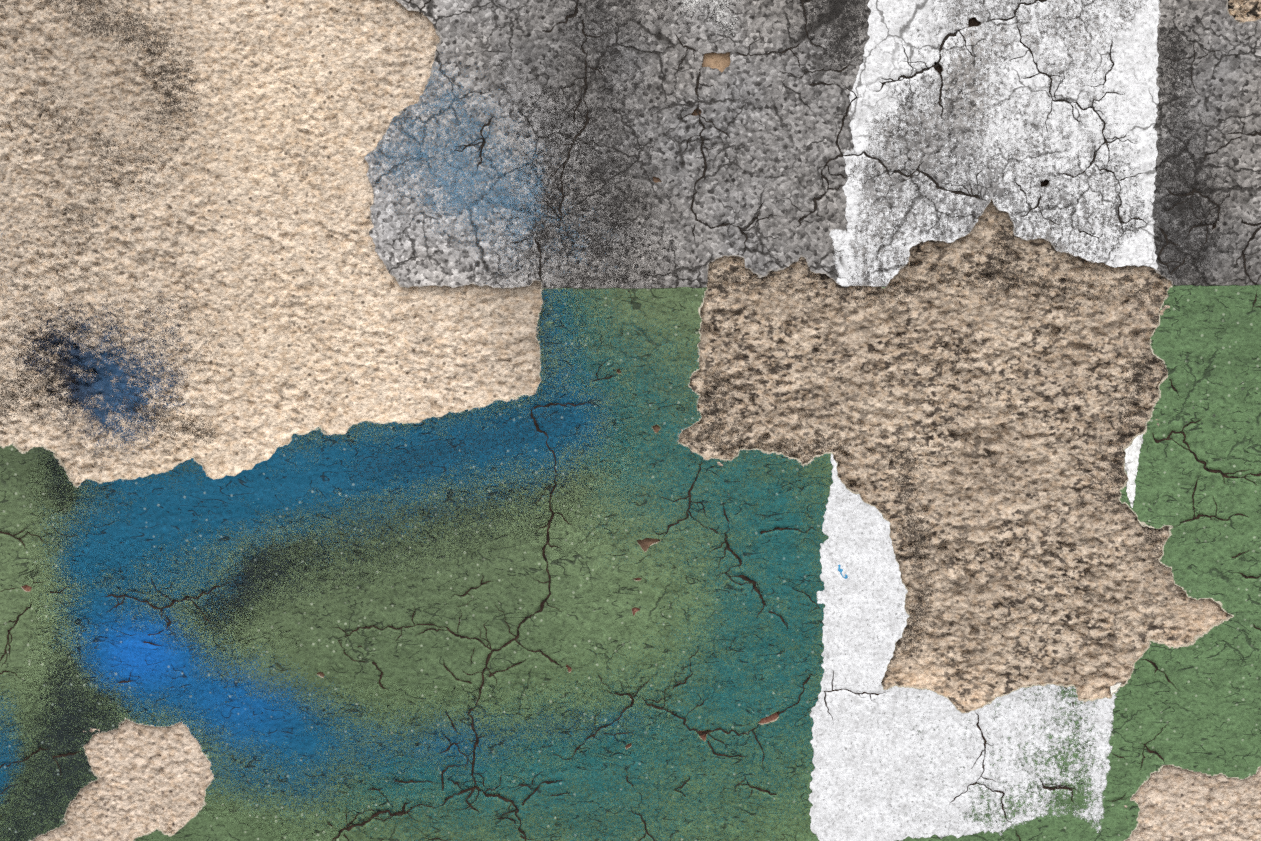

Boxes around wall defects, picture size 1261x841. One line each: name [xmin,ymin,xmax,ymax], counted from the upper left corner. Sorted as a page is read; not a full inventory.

spalling [1228,0,1261,23]
crack [447,116,493,172]
crack [511,0,606,286]
crack [675,0,1261,308]
spalling [0,0,543,485]
spalling [679,200,1229,712]
crack [1152,379,1261,526]
crack [0,526,79,549]
crack [0,578,231,680]
crack [327,355,885,841]
spalling [34,719,213,841]
spalling [1124,765,1261,841]